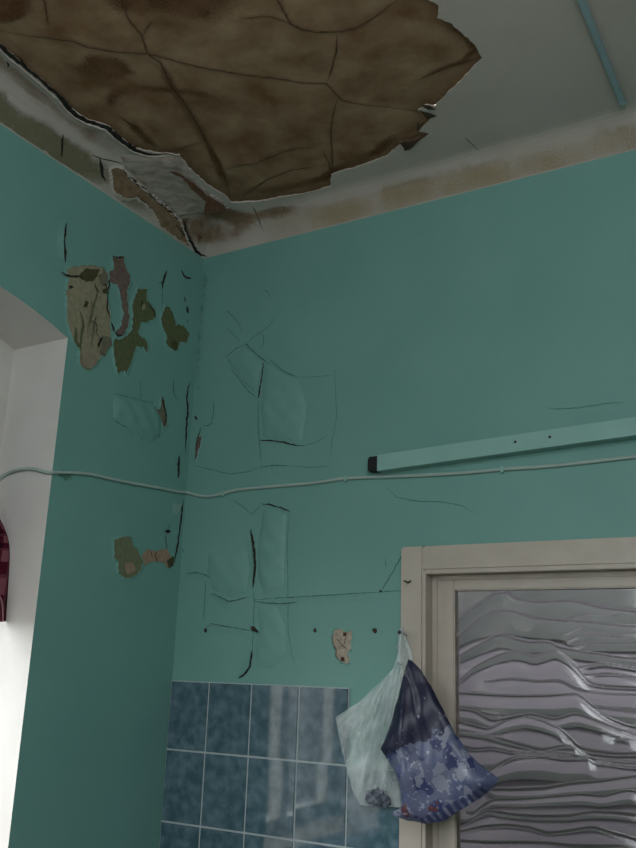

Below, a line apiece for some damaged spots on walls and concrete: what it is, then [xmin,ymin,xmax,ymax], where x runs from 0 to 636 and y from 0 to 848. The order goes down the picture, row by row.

water stain [0,52,162,221]
crack [0,0,412,232]
water stain [65,0,636,250]
peeling [396,105,436,151]
peeling [107,165,191,248]
flaking render [170,171,229,214]
peeling [62,252,191,379]
crack [173,382,214,478]
peeling [111,533,174,583]
flaking render [330,626,355,667]